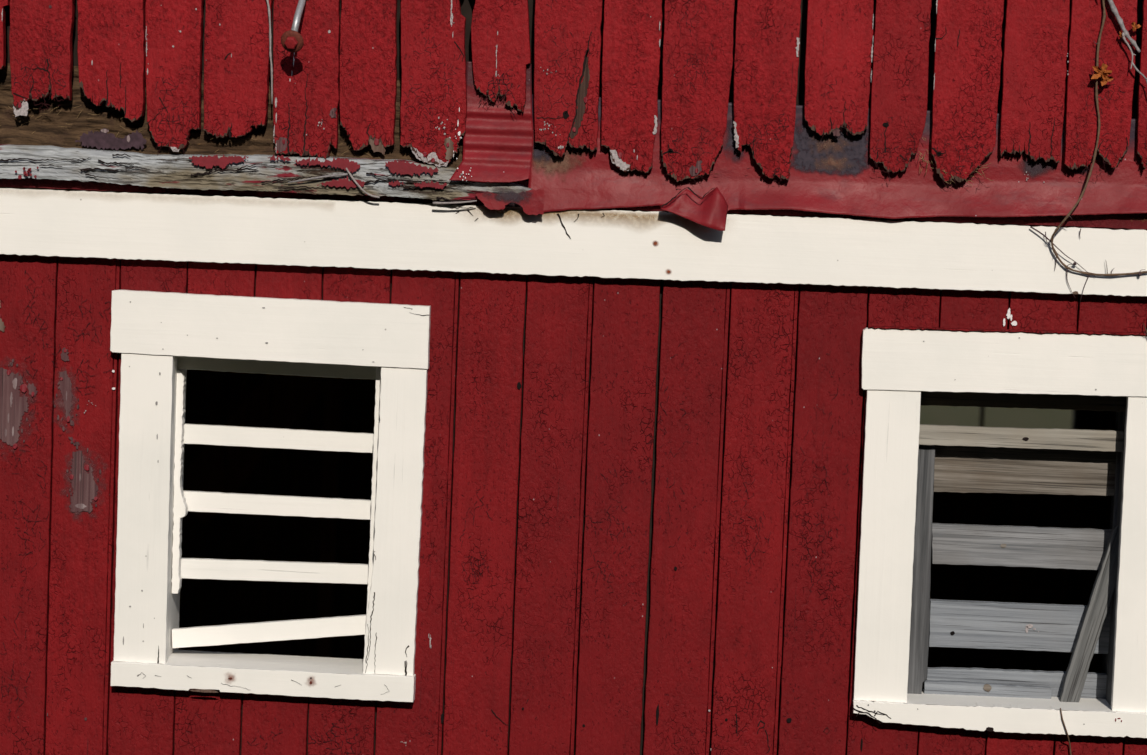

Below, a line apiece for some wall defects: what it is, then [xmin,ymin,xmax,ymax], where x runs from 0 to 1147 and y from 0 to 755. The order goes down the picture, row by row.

peeling [0,359,38,449]
peeling [54,348,101,515]